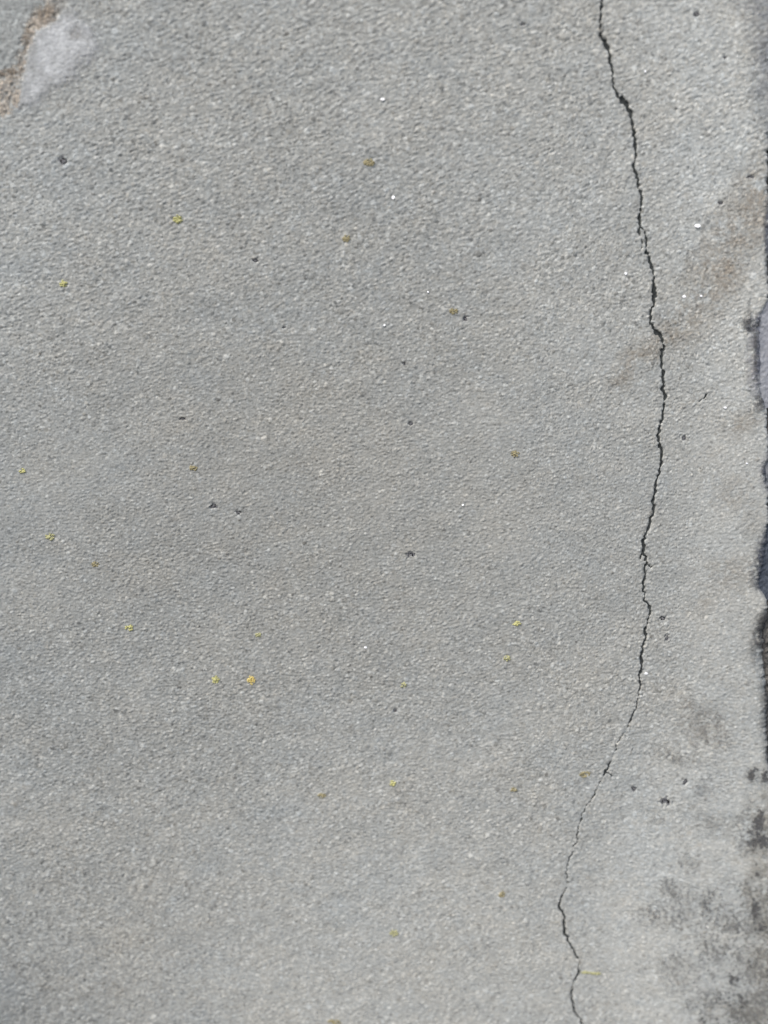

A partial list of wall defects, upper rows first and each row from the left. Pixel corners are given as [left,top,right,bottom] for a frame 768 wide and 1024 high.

crack [558,0,667,1024]